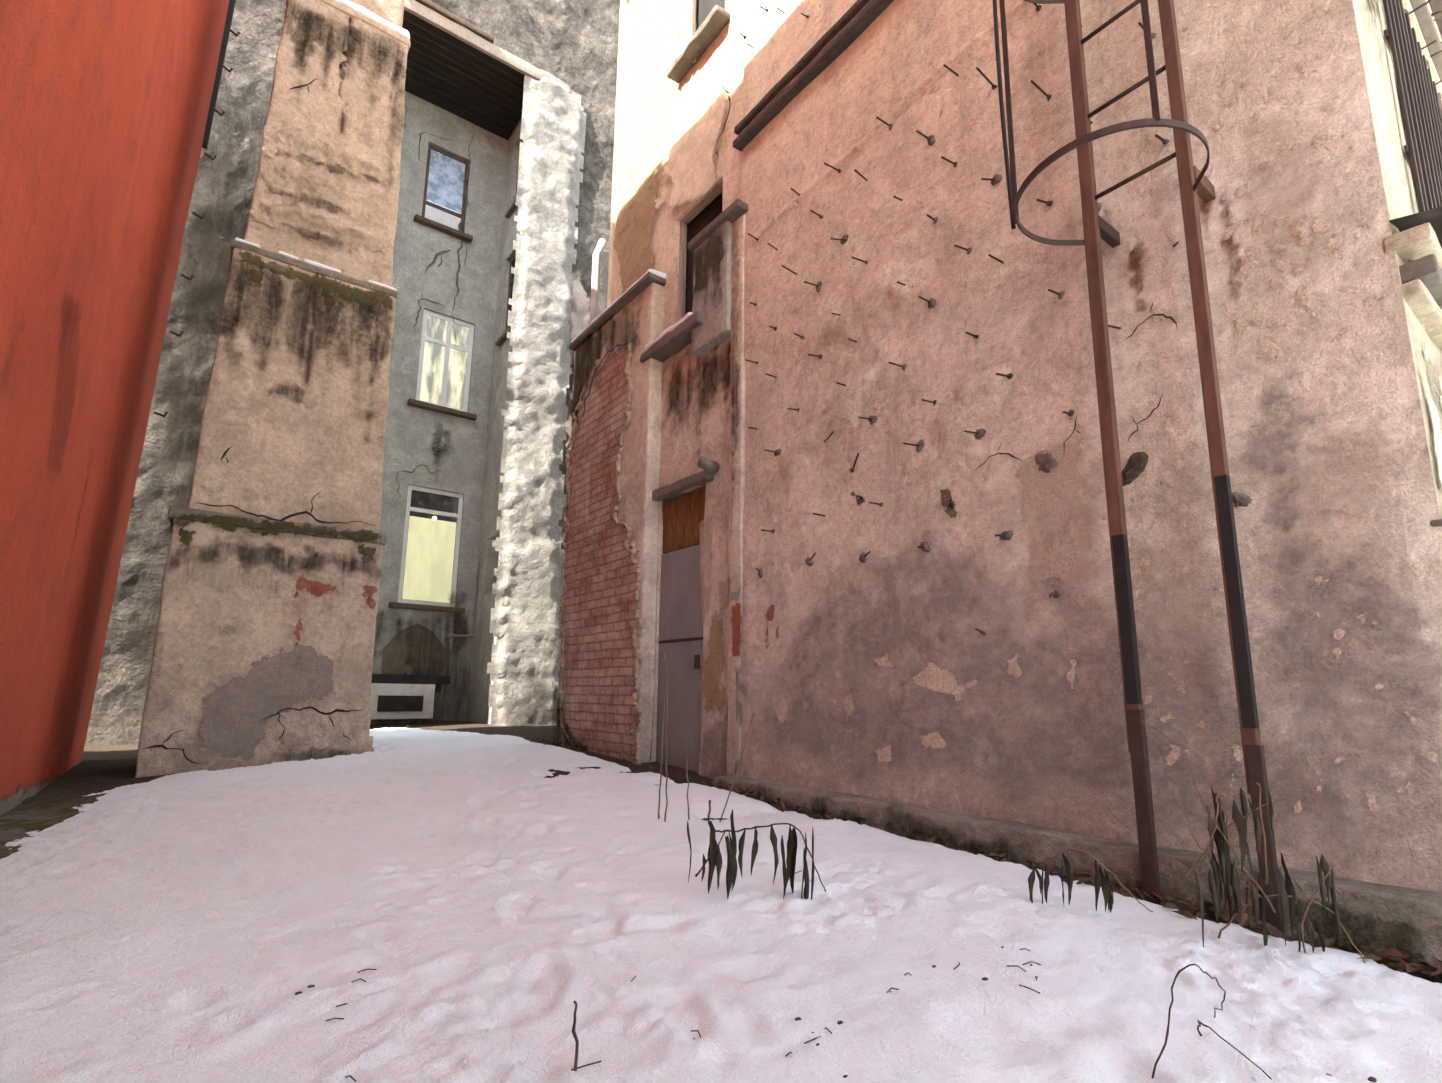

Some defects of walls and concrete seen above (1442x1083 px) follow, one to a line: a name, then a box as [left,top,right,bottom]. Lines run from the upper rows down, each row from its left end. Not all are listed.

water stain [295,12,349,73]
crack [414,132,474,356]
peeling [1422,348,1442,484]
crack [194,491,375,526]
flaking render [510,269,644,764]
crack [143,729,200,764]
crack [260,706,361,743]
peeling [0,776,60,815]